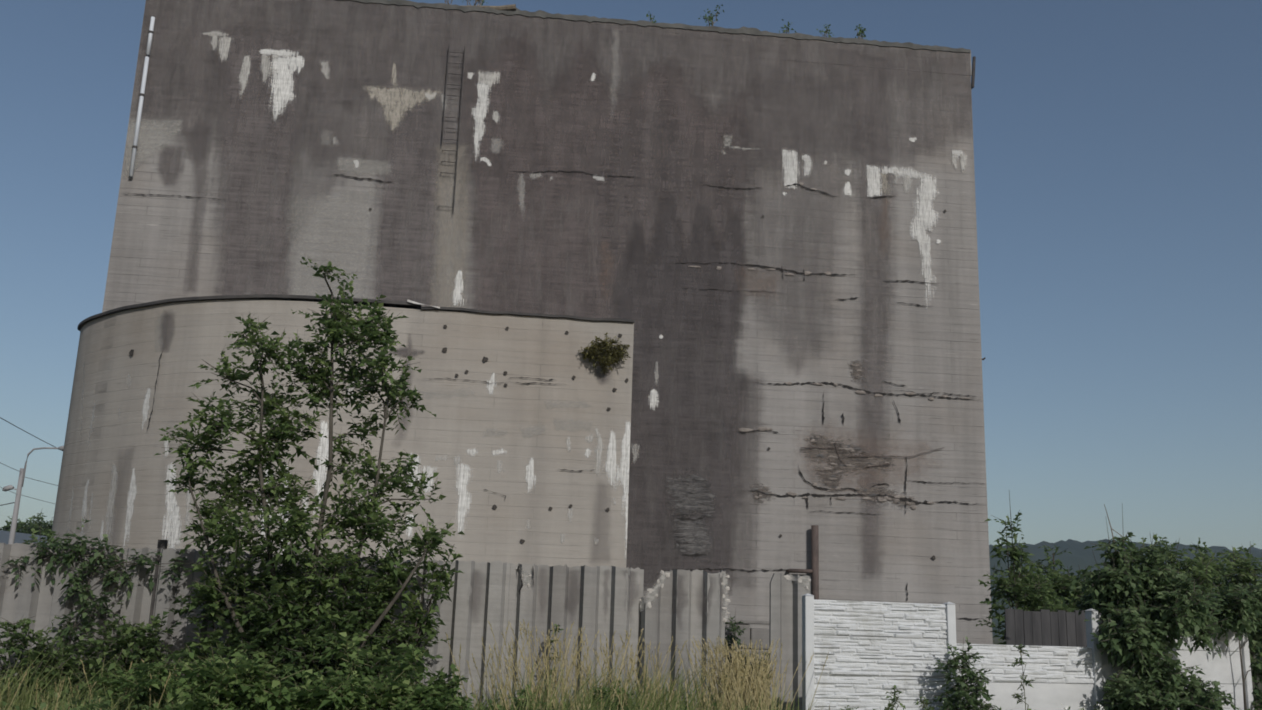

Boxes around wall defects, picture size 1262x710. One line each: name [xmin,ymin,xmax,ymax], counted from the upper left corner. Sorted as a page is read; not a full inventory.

leakage [137,0,972,587]
crack [669,262,858,300]
crack [886,280,934,307]
crack [750,381,979,425]
crack [747,456,984,515]
spalling [800,434,944,508]